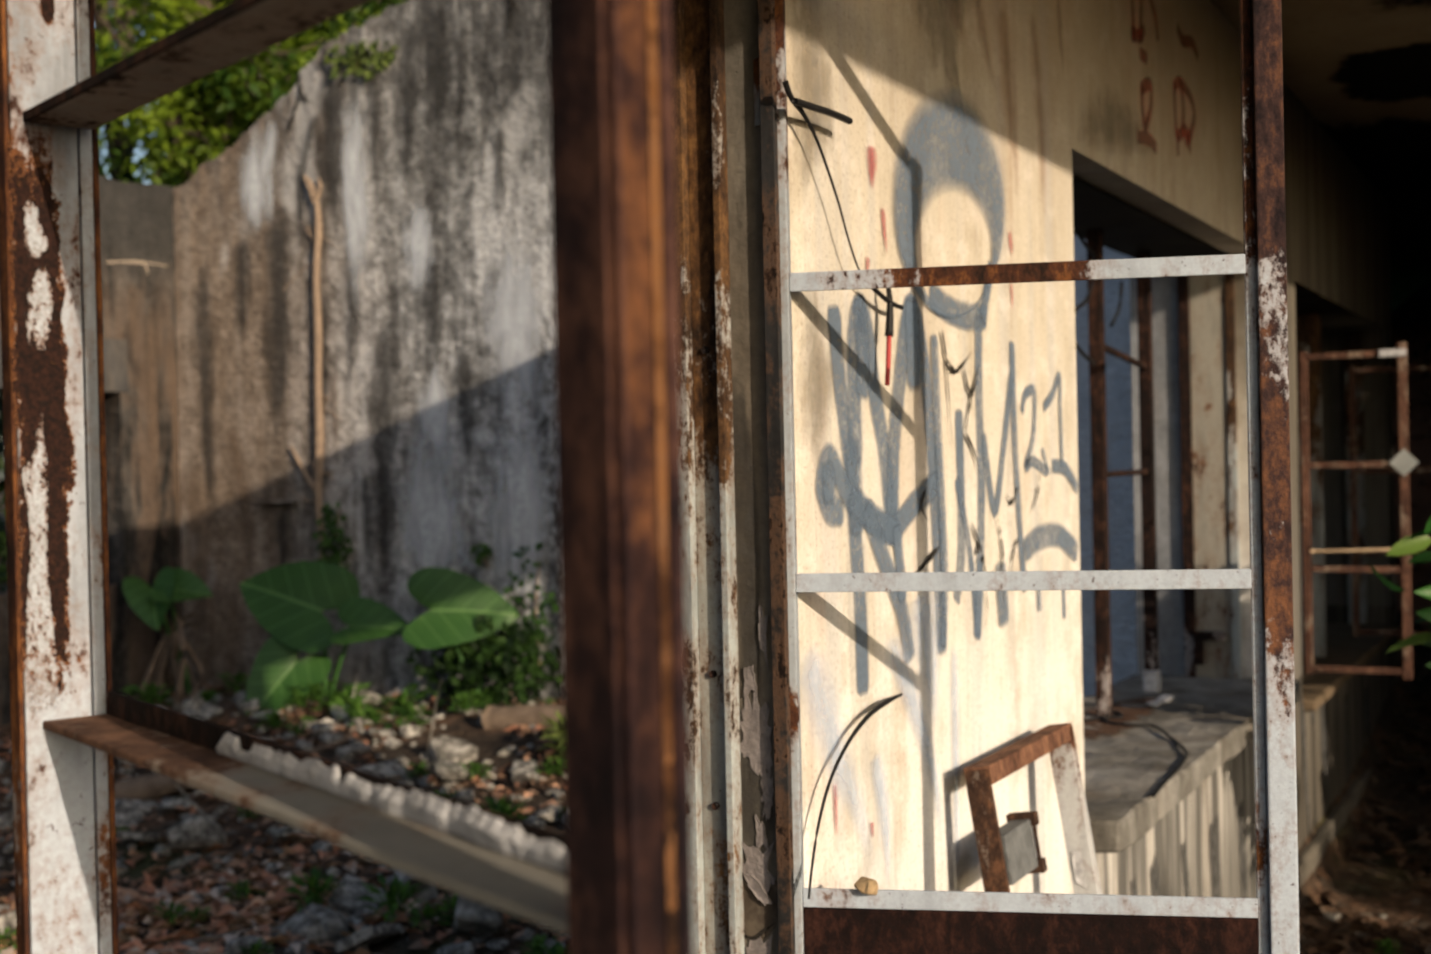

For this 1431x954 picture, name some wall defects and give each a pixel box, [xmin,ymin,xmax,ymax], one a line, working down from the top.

water stain [405,13,465,160]
rust [6,135,77,701]
water stain [198,282,214,485]
water stain [238,244,248,332]
water stain [243,129,274,223]
water stain [267,77,378,412]
water stain [362,338,473,568]
water stain [405,209,439,343]
efflorescence [491,252,539,396]
water stain [490,430,545,595]
peeling [740,605,778,954]